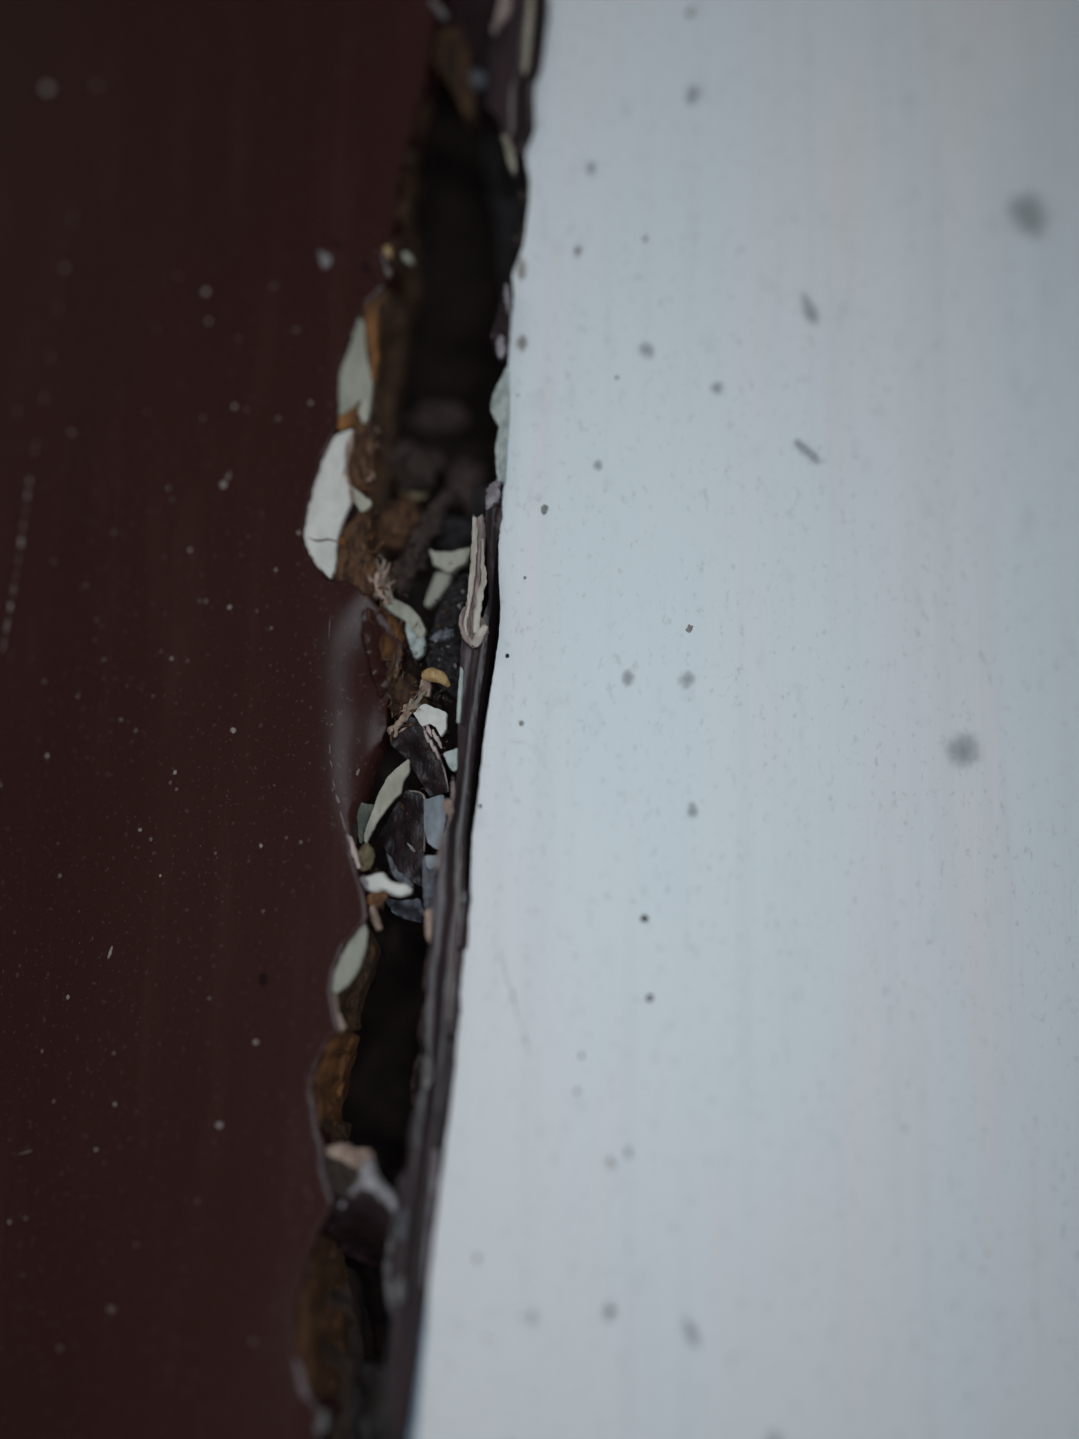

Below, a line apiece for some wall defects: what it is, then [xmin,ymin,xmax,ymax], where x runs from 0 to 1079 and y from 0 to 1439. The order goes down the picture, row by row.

peeling [492,0,534,76]
peeling [503,135,527,204]
peeling [371,246,414,286]
peeling [485,284,513,511]
peeling [304,318,375,579]
peeling [362,572,453,697]
peeling [414,679,458,772]
peeling [357,759,410,844]
peeling [360,872,413,897]
peeling [425,855,438,870]
peeling [332,924,368,1032]
peeling [423,1055,434,1089]